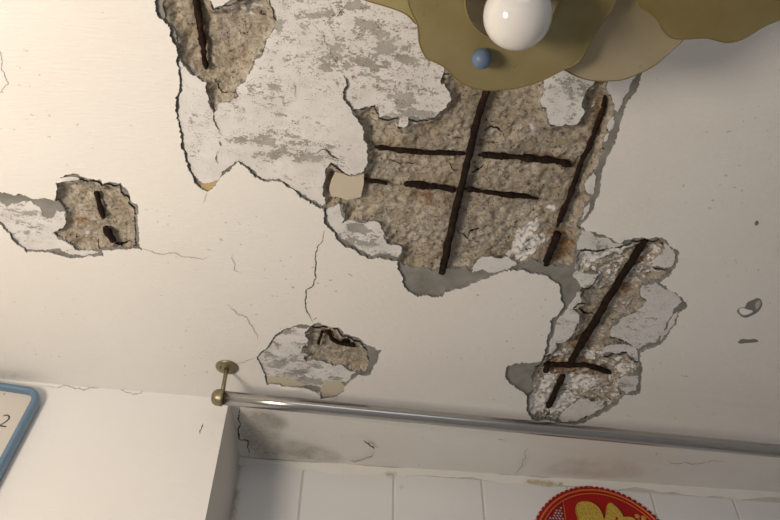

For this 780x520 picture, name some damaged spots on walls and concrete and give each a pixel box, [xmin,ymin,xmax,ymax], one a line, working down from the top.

spalling [0,173,140,256]
spalling [156,0,686,424]
crack [305,233,324,322]
peeling [737,298,762,318]